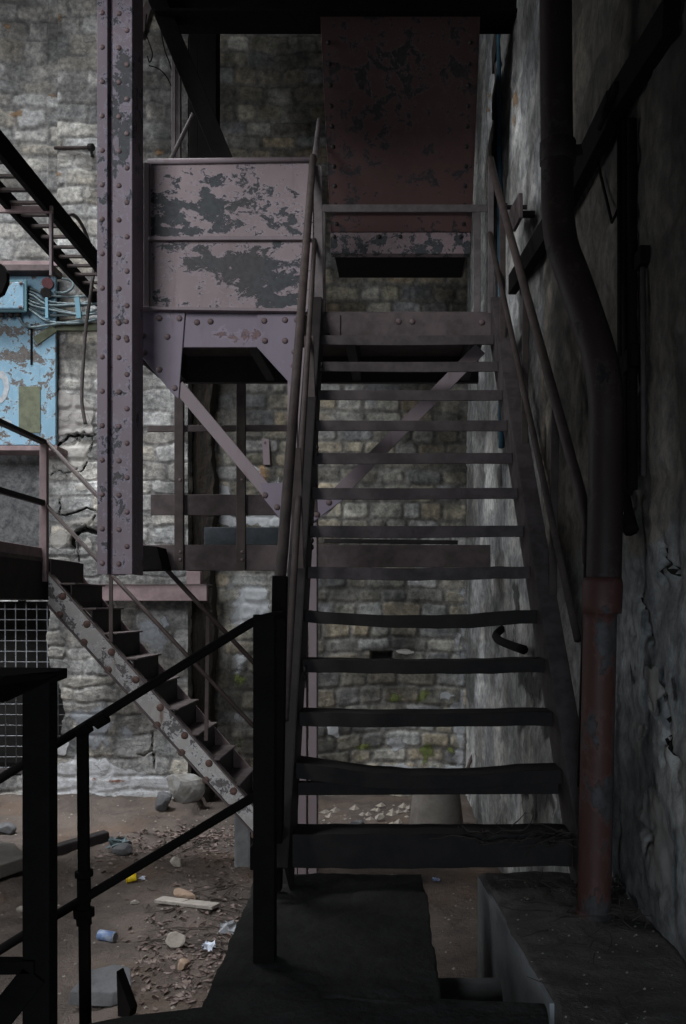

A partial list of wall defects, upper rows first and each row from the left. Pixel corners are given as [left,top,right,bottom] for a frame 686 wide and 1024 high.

crack [51,431,97,562]
flaking render [631,665,678,715]
peeling [58,742,174,799]